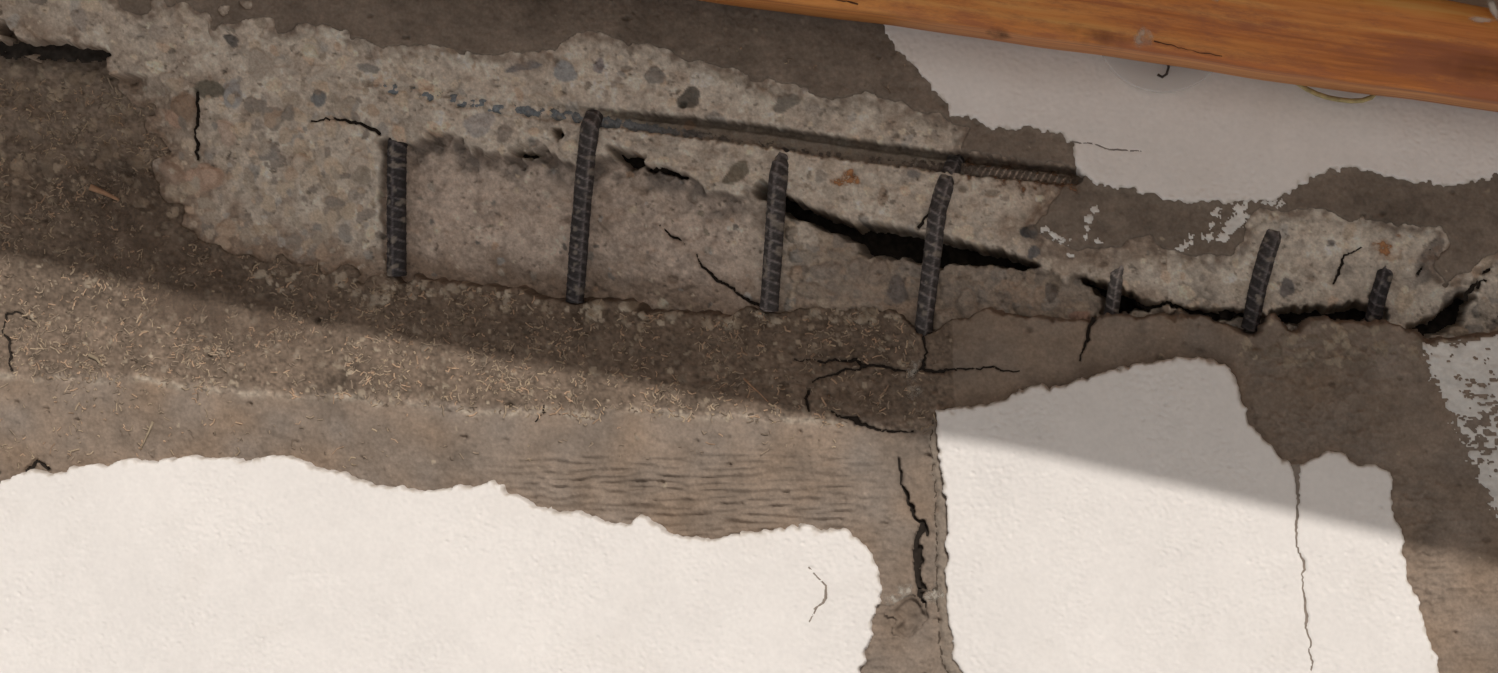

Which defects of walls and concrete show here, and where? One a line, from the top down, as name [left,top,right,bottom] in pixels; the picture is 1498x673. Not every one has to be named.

spalling [0,0,1246,332]
crack [650,167,689,180]
crack [659,225,760,307]
crack [785,196,1034,271]
crack [2,311,34,372]
crack [794,336,1020,673]
crack [1291,464,1314,672]